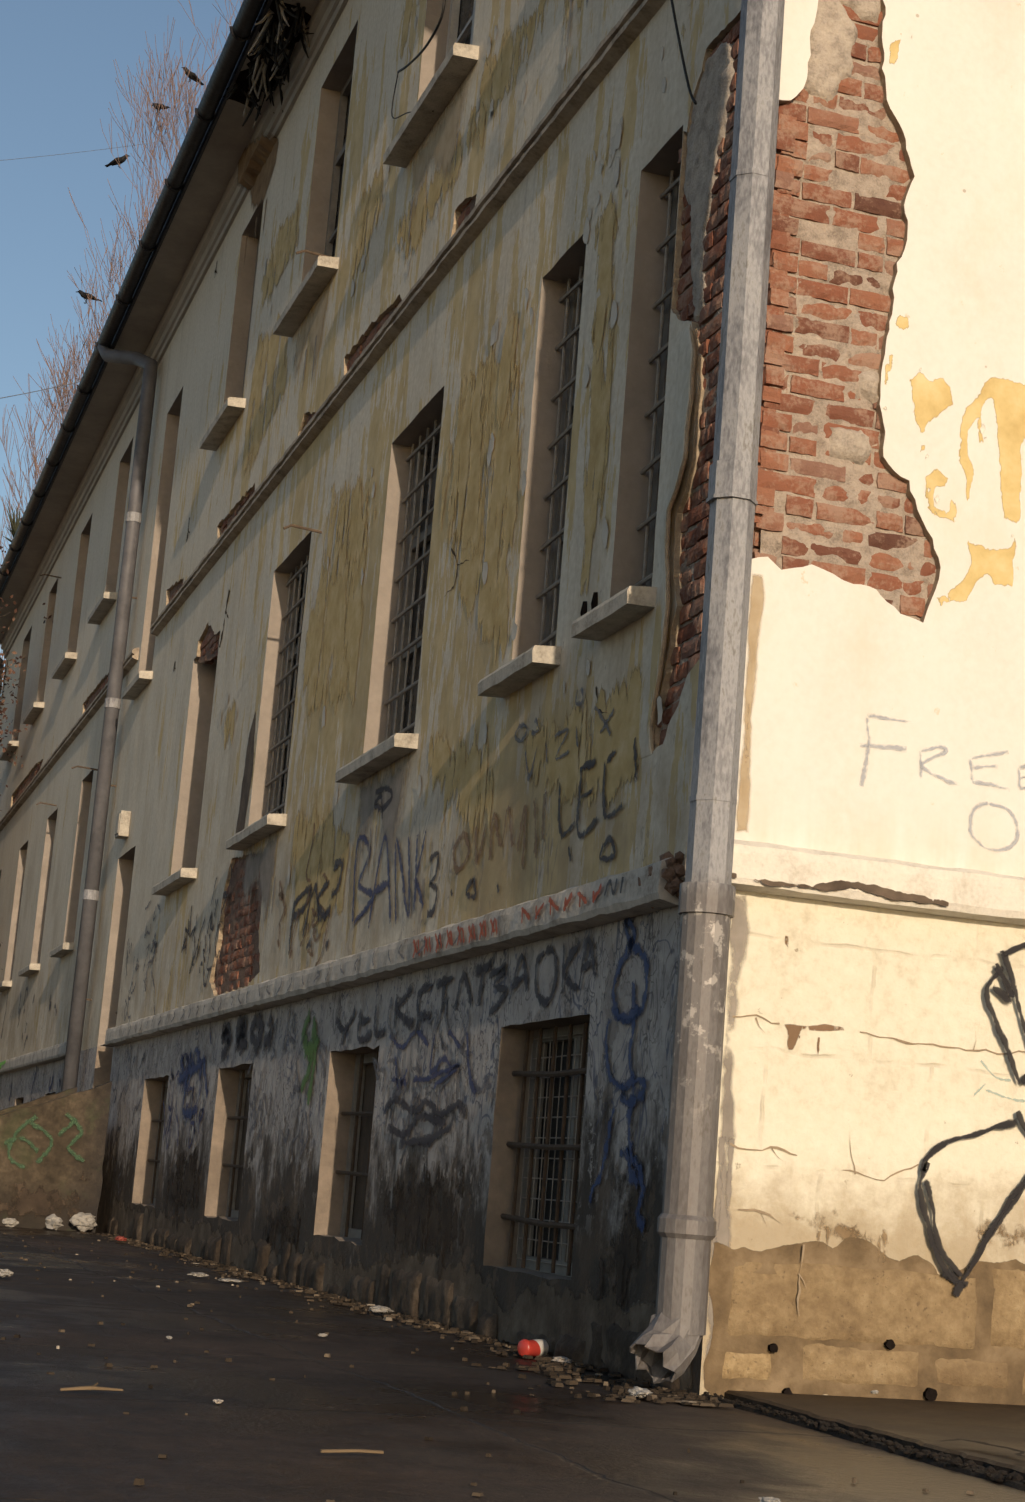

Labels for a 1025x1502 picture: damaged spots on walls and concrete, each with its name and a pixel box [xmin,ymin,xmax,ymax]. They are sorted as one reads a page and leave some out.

peeling [221,204,299,535]
peeling [441,288,533,662]
spalling [524,20,740,809]
spalling [752,0,1025,621]
spalling [199,626,220,665]
peeling [303,467,376,727]
spalling [219,693,256,833]
spalling [214,854,262,995]
peeling [287,783,353,939]
damp [383,1150,465,1282]
damp [818,1222,860,1243]
damp [978,1221,1025,1246]